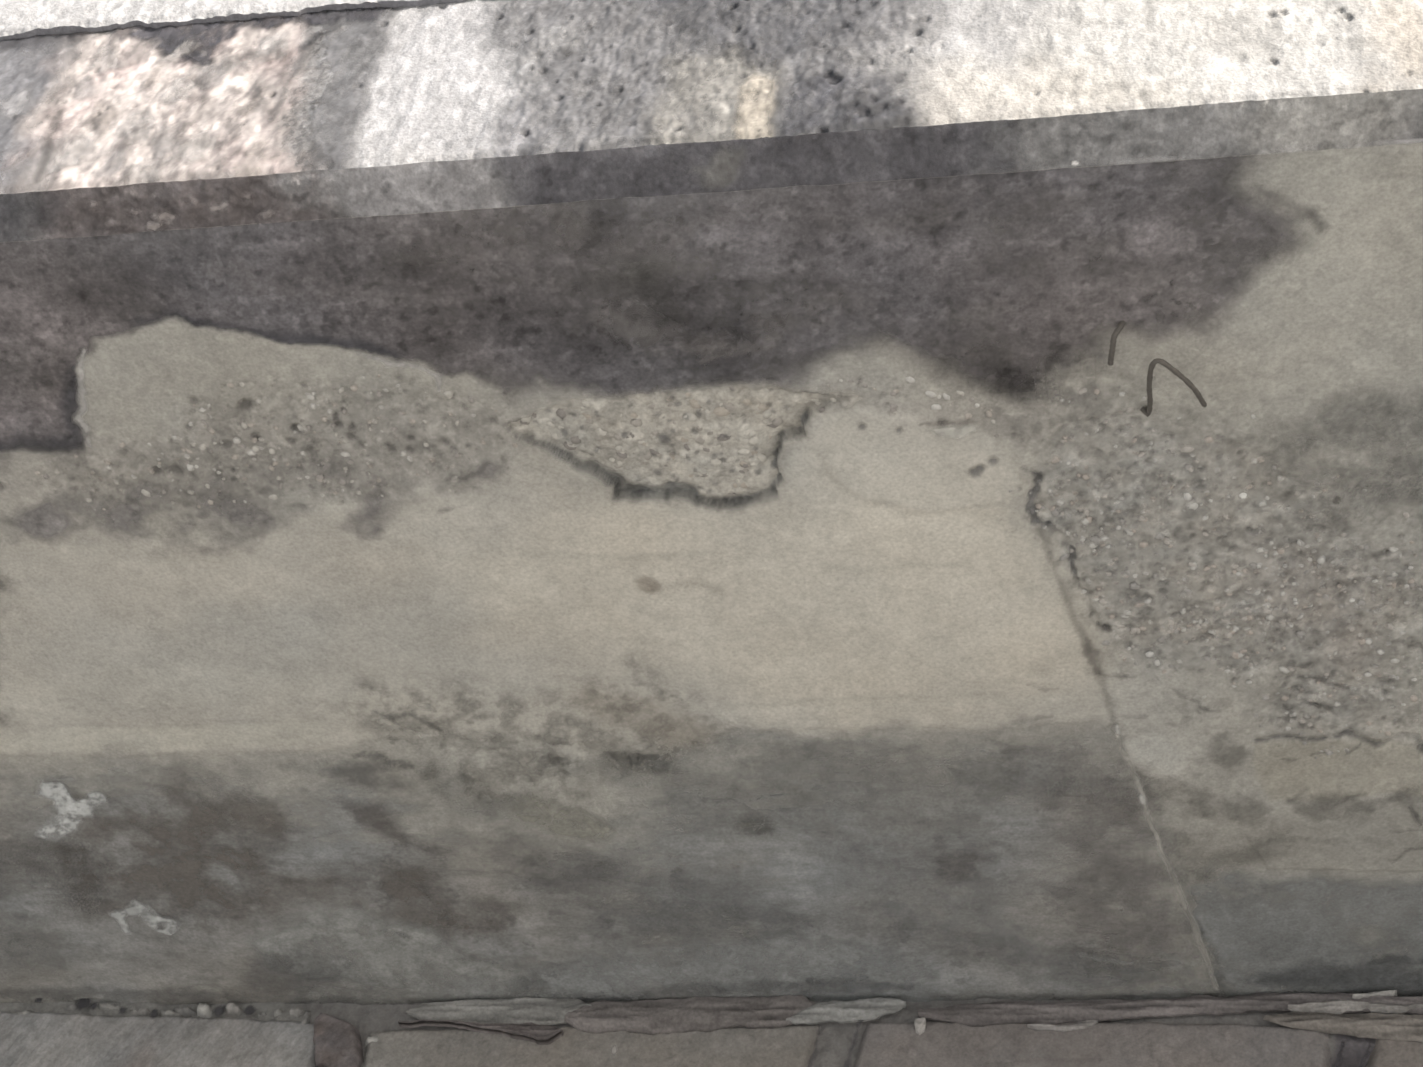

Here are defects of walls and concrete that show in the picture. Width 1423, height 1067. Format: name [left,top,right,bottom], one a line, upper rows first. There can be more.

leakage [0,0,1294,451]
spalling [82,374,476,511]
leakage [0,693,1423,1005]
spalling [495,377,999,503]
spalling [1009,387,1423,759]
crack [1255,664,1378,746]